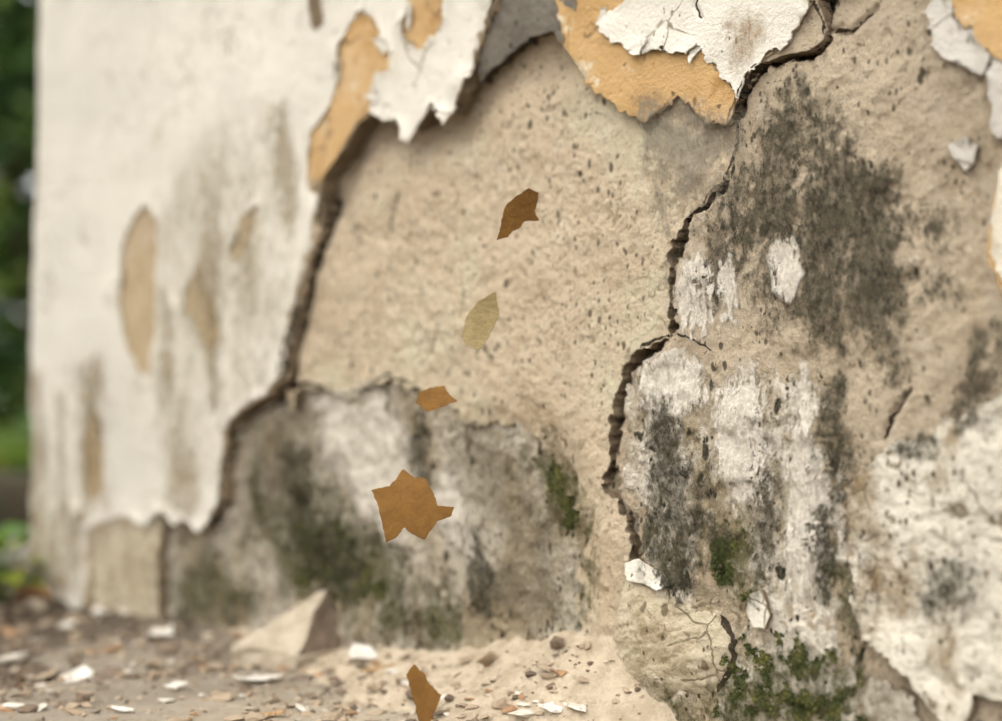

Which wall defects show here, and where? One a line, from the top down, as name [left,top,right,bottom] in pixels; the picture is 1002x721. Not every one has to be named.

crack [809,0,879,44]
peeling [307,13,389,182]
crack [686,60,804,223]
crack [209,187,415,535]
crack [640,333,712,366]
leakage [631,71,961,610]
leakage [951,315,1002,437]
leakage [259,384,559,627]
peeling [406,664,441,721]
peeling [739,589,773,634]
spalling [832,603,939,721]
leakage [915,557,979,628]